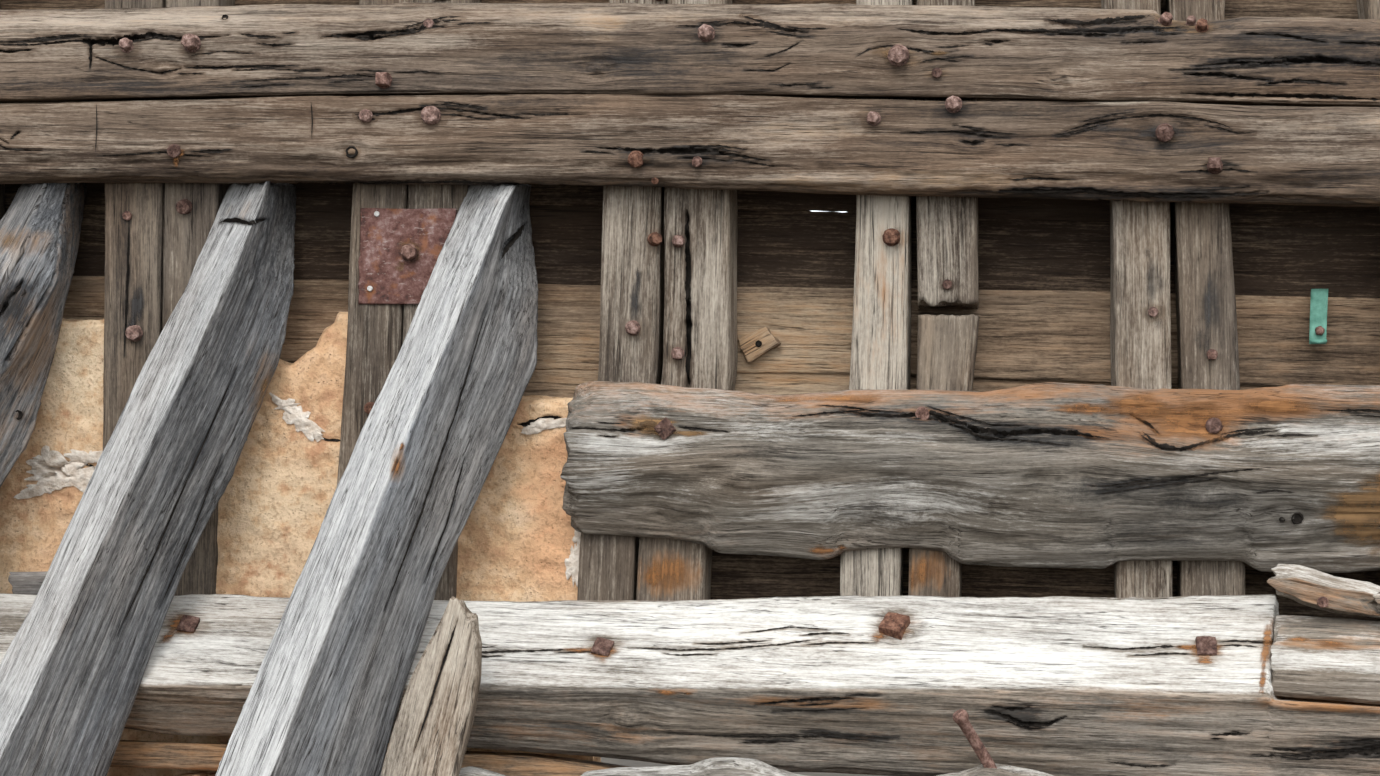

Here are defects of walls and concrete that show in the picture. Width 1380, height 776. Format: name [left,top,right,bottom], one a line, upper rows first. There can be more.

crack [0,16,577,138]
crack [856,15,1380,199]
crack [584,145,775,166]
spalling [269,392,325,442]
corrosion [1059,394,1307,438]
spalling [14,445,103,499]
crack [792,405,1380,494]
corrosion [1327,474,1380,544]
crack [988,706,1064,730]